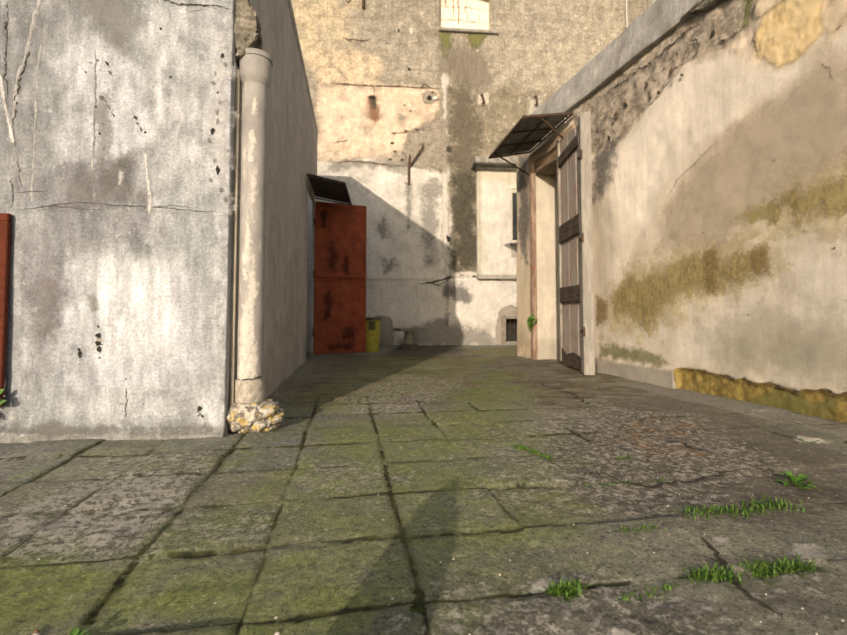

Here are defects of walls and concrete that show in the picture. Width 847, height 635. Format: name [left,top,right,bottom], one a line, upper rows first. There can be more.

crack [10,180,227,213]
crack [157,0,228,12]
peeling [208,34,231,182]
water stain [422,46,490,303]
flaking render [575,0,847,154]
water stain [666,72,847,237]
water stain [596,296,608,325]
water stain [703,251,717,293]